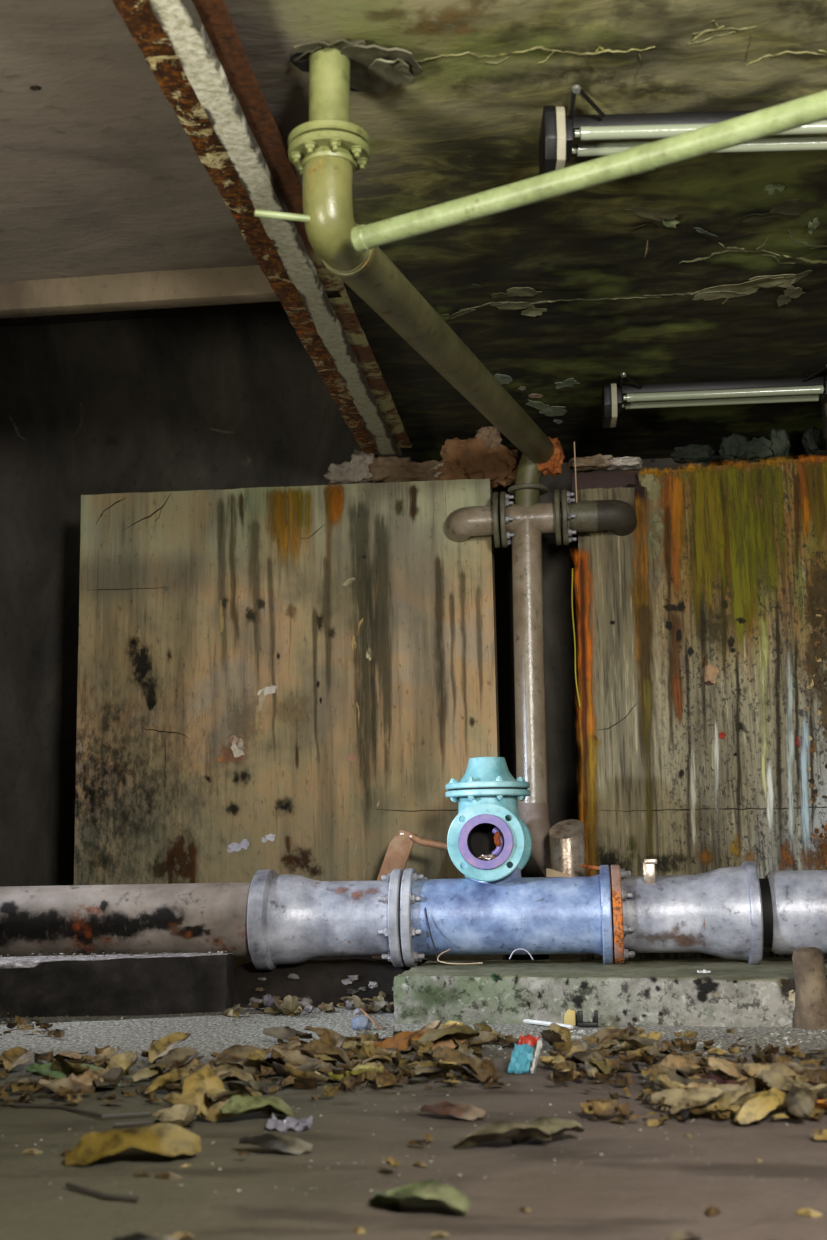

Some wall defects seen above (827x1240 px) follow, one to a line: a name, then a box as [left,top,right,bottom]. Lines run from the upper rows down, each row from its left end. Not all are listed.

crack [417,46,655,79]
crack [687,20,827,65]
peeling [440,270,812,321]
spalling [324,427,520,488]
corrosion [270,489,309,560]
corrosion [326,486,343,524]
leakage [350,505,391,806]
leakage [436,559,445,751]
corrosion [632,456,827,858]
corrosion [575,551,598,876]
leakage [276,800,292,813]
corrosion [781,823,827,871]